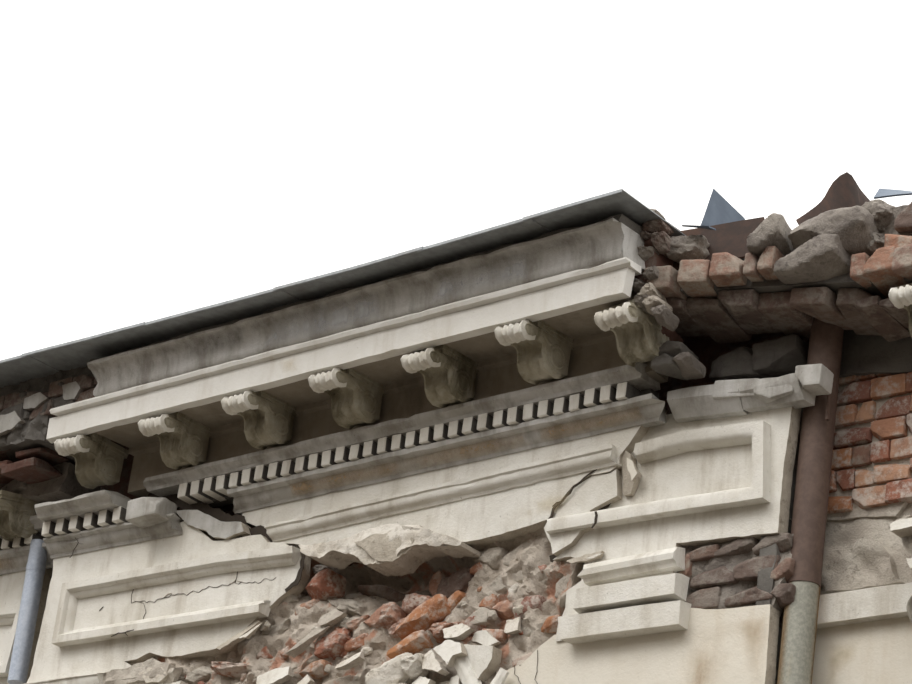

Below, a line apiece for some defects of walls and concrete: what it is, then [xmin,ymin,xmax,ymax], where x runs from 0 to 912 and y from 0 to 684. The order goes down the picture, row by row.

spalling [632,199,912,382]
spalling [0,365,100,503]
crack [111,493,305,637]
spalling [103,526,605,684]
crack [548,470,596,519]
crack [591,503,611,528]
spalling [677,533,796,628]
spalling [820,538,905,595]
spalling [827,372,912,569]